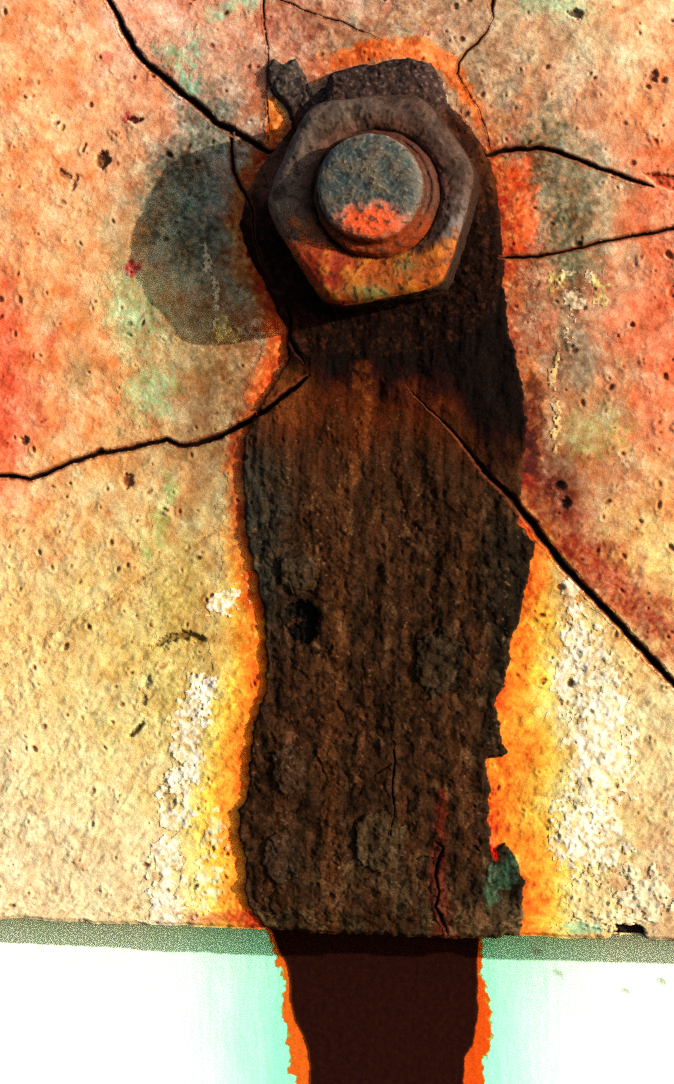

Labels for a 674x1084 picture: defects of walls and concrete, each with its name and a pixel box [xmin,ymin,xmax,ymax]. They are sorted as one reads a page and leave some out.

crack [0,0,382,484]
crack [455,0,653,188]
crack [498,224,674,262]
damp [90,0,364,1084]
corrosion [176,33,674,1084]
crack [405,383,674,693]
damp [477,578,674,1084]